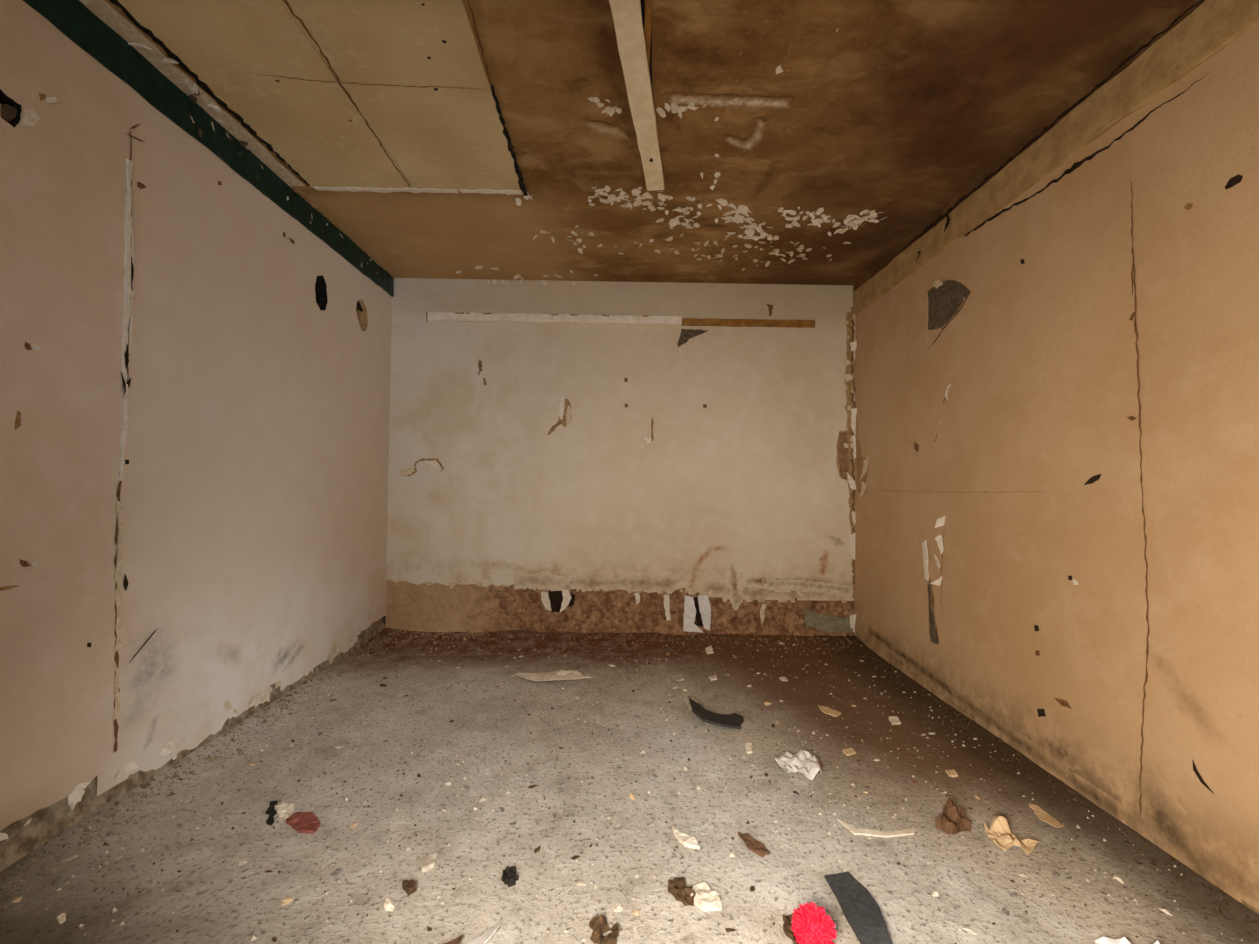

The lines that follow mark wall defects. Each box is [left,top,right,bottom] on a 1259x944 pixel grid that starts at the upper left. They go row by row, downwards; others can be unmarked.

spalling [0,89,57,128]
peeling [588,97,622,116]
damp [540,0,713,200]
peeling [656,99,707,118]
damp [667,0,1176,206]
peeling [533,225,623,255]
peeling [588,172,886,271]
spalling [356,300,368,331]
flaking render [927,279,971,345]
flaking render [0,307,869,873]